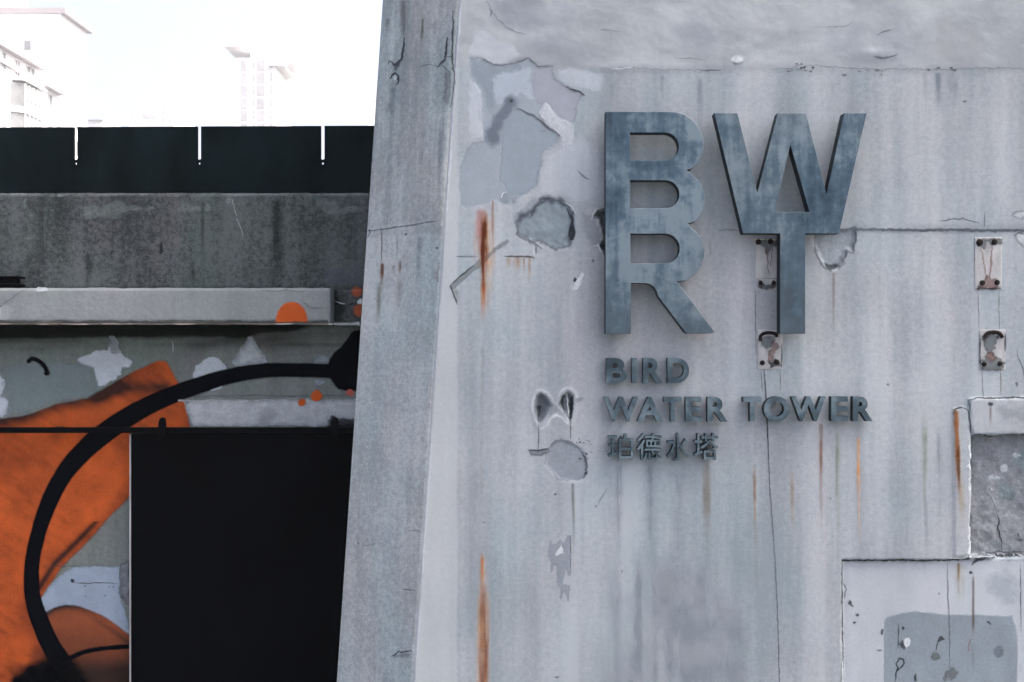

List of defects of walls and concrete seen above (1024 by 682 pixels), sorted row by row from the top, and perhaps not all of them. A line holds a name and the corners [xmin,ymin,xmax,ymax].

crack [388,11,455,107]
peeling [450,57,585,305]
crack [365,220,440,236]
corrosion [480,204,493,293]
spalling [814,226,857,272]
spalling [529,392,588,480]
peeling [548,535,571,601]
corrosion [479,605,487,682]